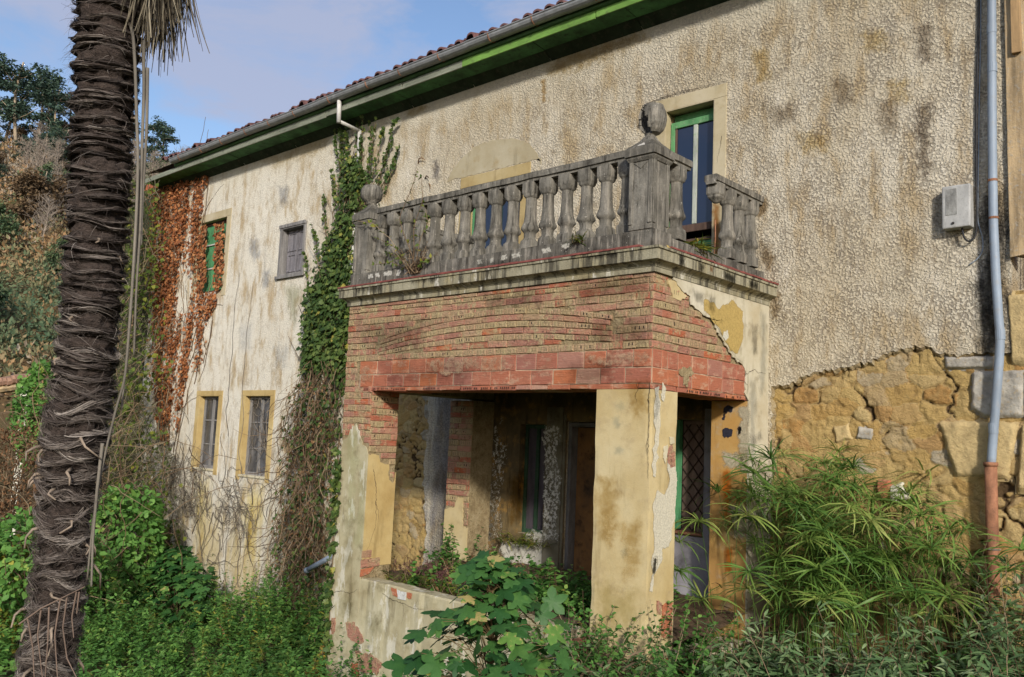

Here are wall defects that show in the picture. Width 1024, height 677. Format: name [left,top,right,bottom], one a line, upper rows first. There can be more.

spalling [342,272,746,577]
peeling [649,382,678,638]
peeling [722,405,752,470]
spalling [769,290,1024,677]